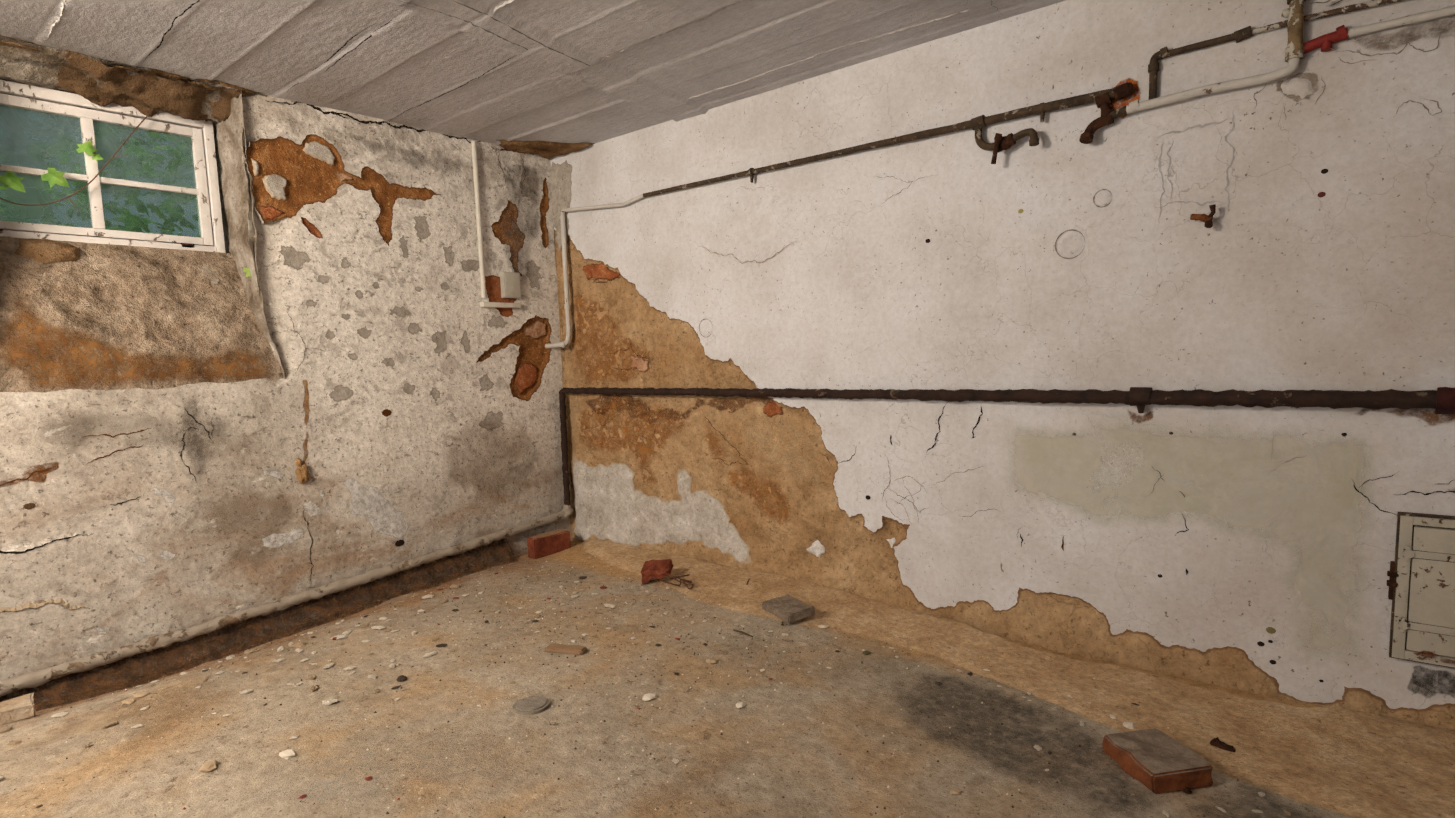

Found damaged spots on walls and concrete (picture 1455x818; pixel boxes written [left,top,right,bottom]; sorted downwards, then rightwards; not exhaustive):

rust [1109,78,1140,118]
crack [82,409,214,483]
spalling [245,134,1455,730]
crack [840,402,983,524]
crack [0,496,141,554]